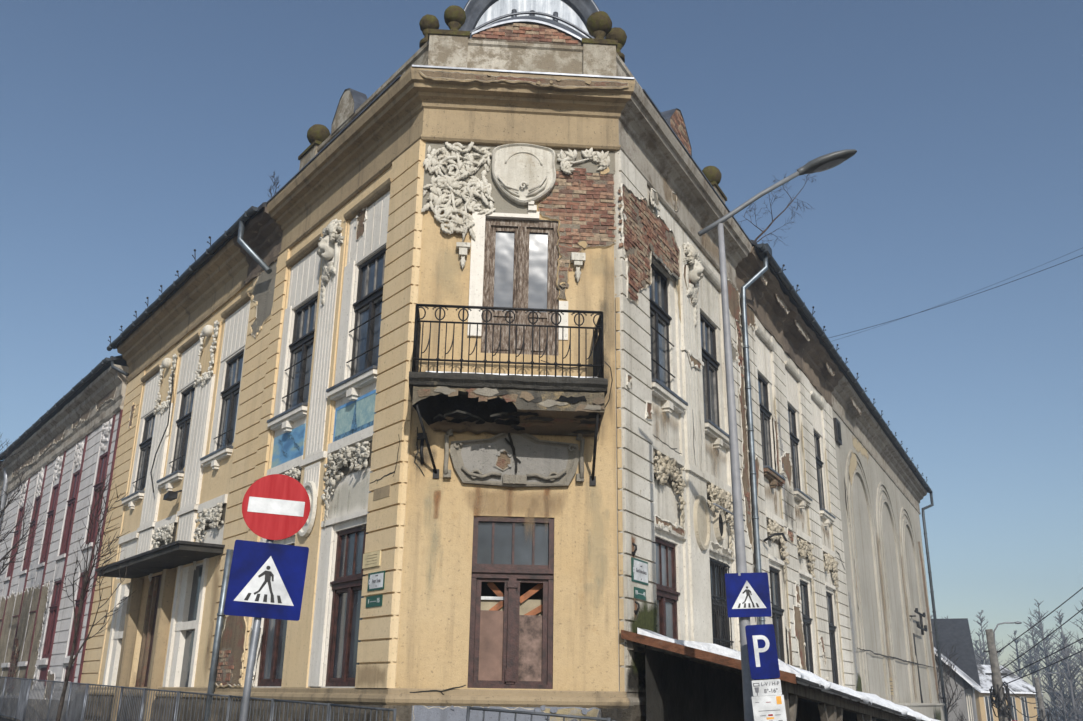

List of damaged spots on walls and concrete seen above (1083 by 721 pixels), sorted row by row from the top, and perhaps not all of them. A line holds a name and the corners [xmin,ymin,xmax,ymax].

flaking render [537,165,699,320]
spalling [417,386,606,434]
peeling [727,279,760,573]
peeling [773,401,807,545]
peeling [786,572,830,682]
peeling [411,705,602,721]